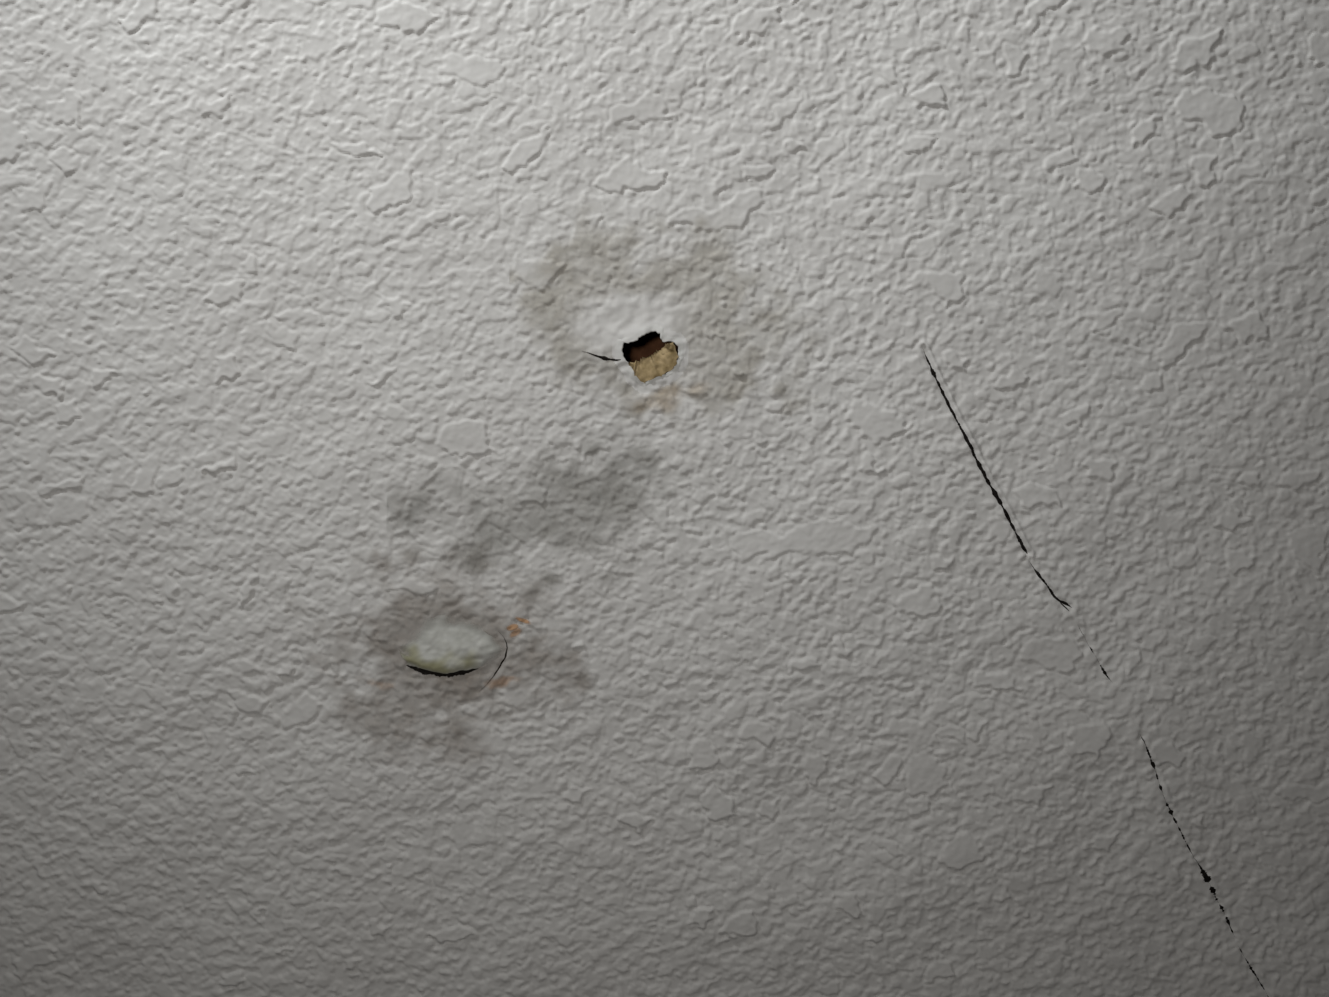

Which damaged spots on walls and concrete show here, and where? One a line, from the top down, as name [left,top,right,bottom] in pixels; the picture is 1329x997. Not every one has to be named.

spalling [628,342,679,383]
crack [925,355,1111,681]
crack [1140,734,1268,996]